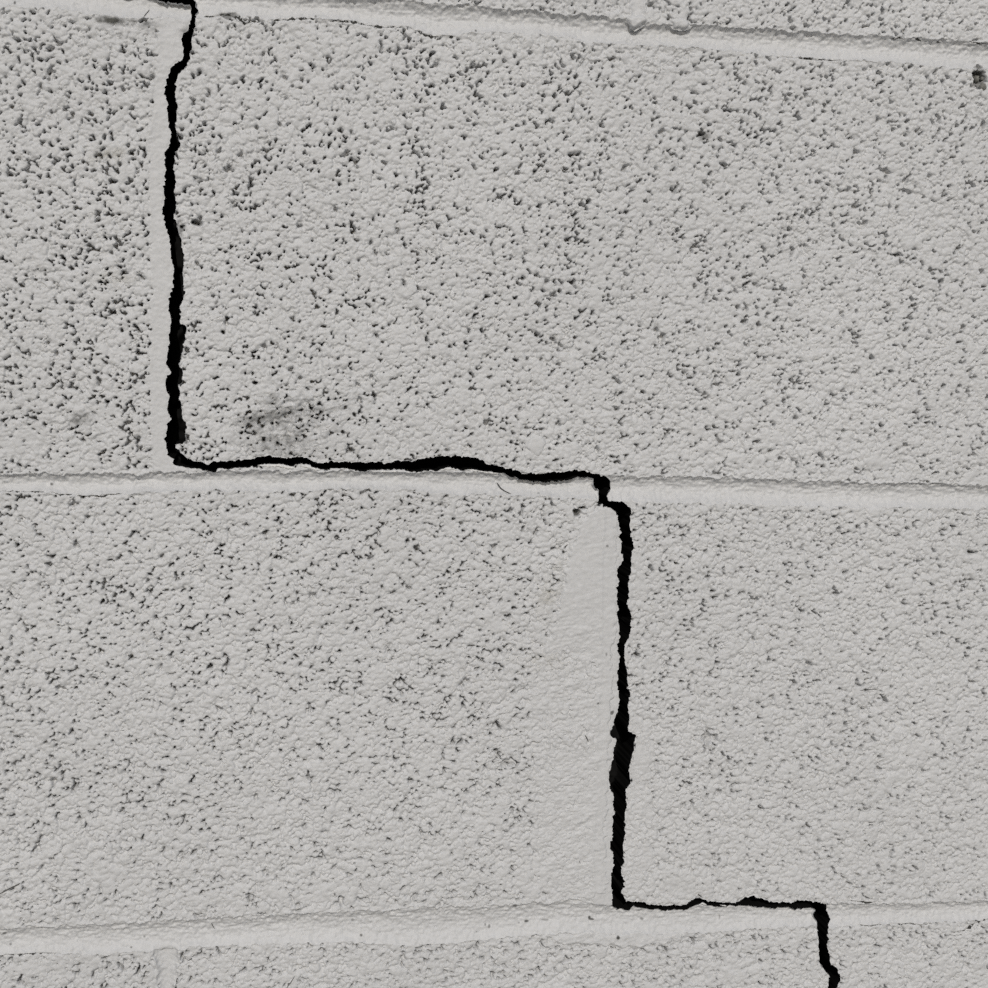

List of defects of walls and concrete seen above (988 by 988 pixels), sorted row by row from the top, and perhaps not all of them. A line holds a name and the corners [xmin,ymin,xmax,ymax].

crack [8,490,122,500]
crack [159,0,927,988]